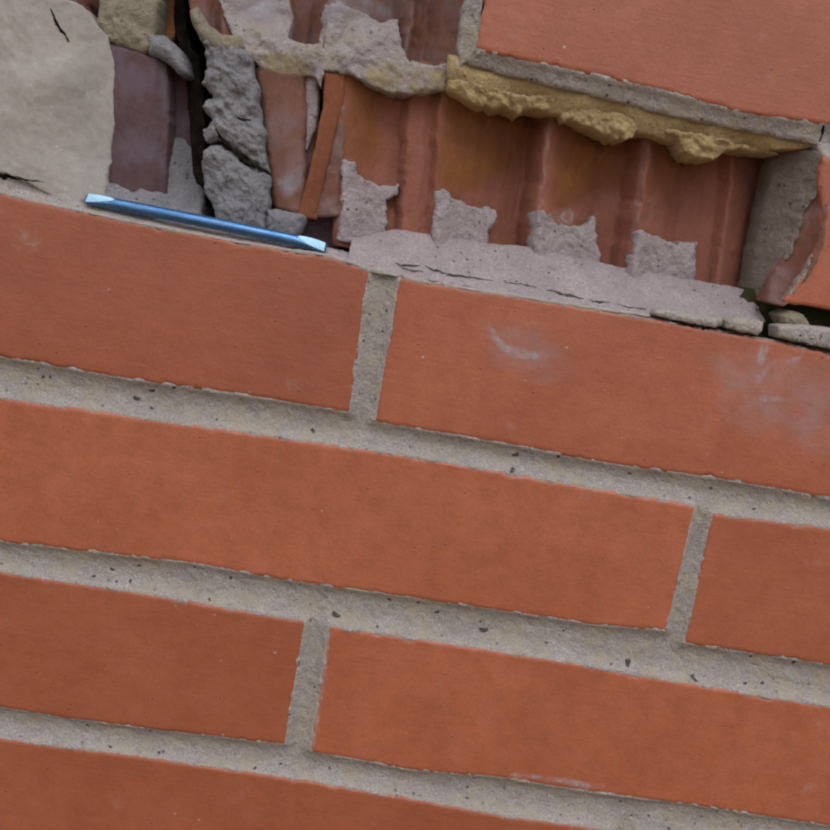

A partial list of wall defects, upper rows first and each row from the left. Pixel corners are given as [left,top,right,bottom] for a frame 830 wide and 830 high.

crack [50,9,69,42]
spalling [70,0,100,18]
spalling [165,0,178,46]
spalling [103,44,216,218]
crack [0,173,41,182]
spalling [189,0,828,326]
spalling [81,198,163,220]
crack [395,263,830,353]